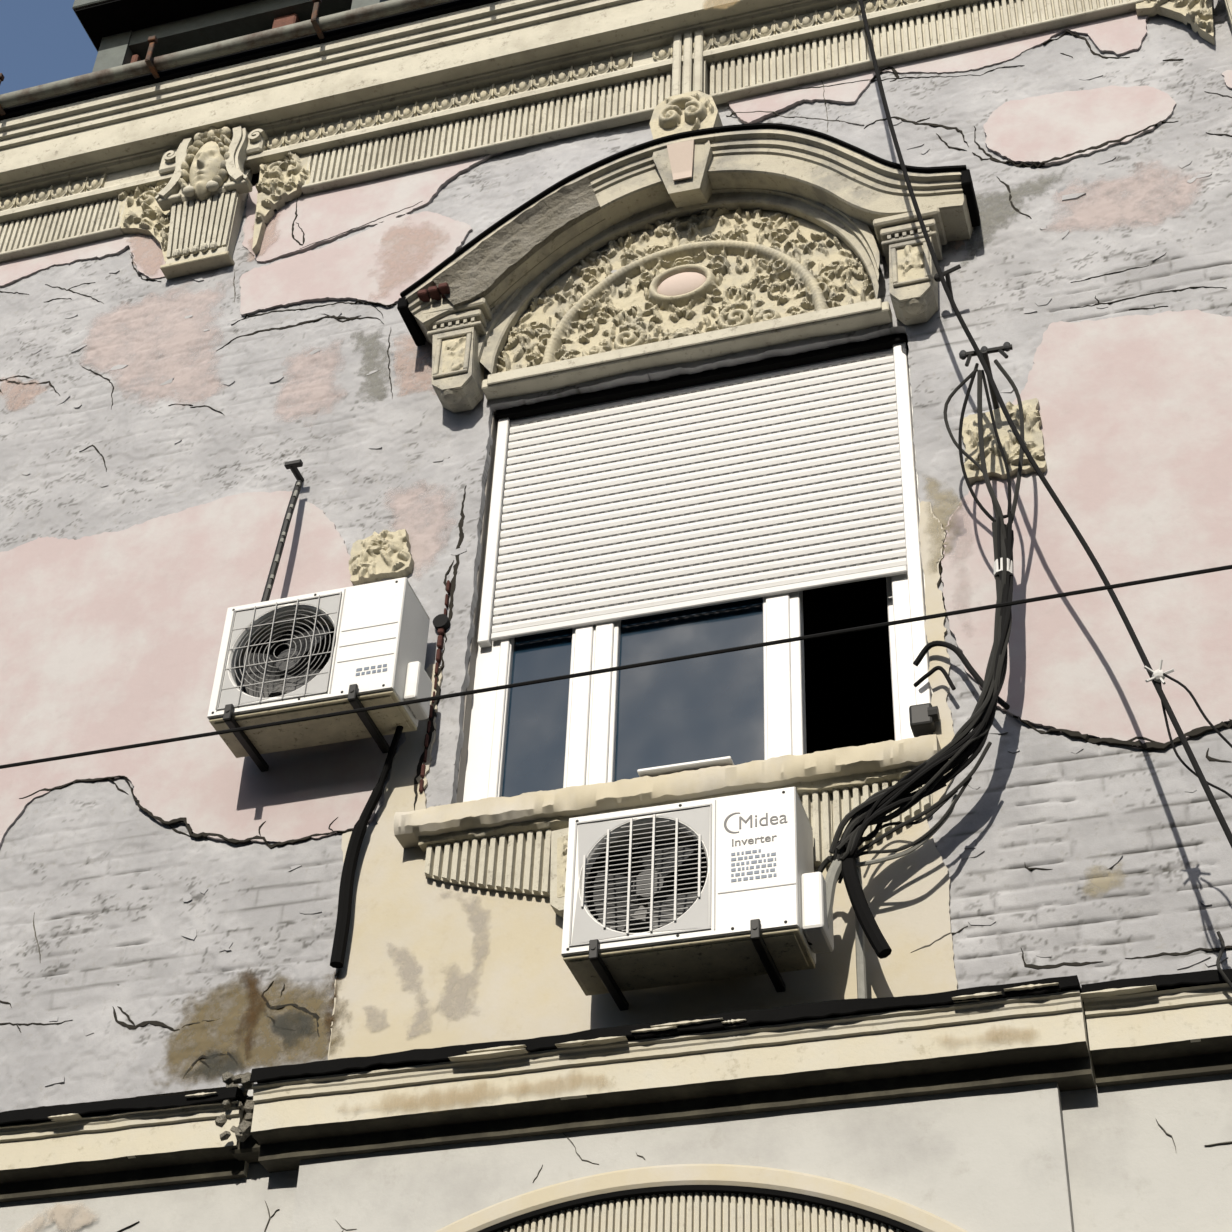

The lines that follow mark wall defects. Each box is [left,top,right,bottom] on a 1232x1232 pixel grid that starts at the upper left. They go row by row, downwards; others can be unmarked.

crack [726,30,1178,218]
crack [0,375,60,396]
crack [0,282,104,304]
crack [130,255,161,282]
crack [216,272,398,397]
crack [292,197,422,249]
flaking render [0,0,1232,810]
crack [1070,265,1227,311]
flaking render [367,768,392,827]
flaking render [928,708,1232,990]
flaking render [0,778,344,1112]
leakage [167,970,340,1080]